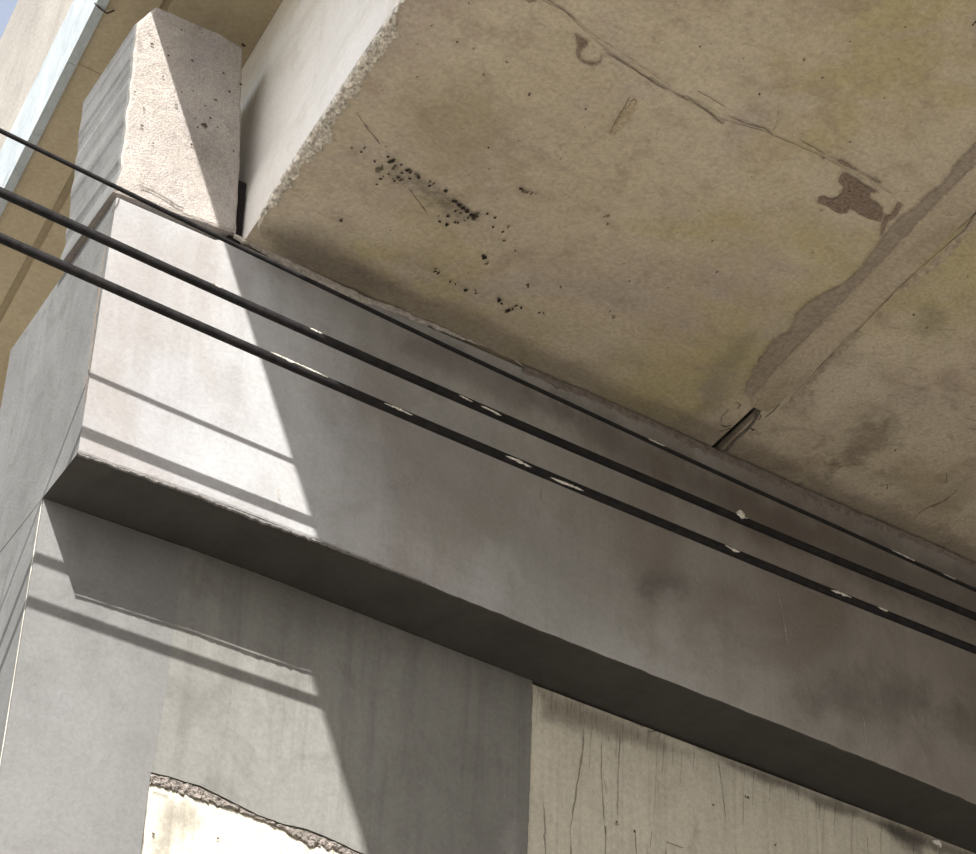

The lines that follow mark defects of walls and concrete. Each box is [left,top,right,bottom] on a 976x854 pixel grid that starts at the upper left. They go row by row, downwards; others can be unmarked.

spalling [256,0,406,228]
crack [543,0,879,186]
water stain [743,143,976,397]
crack [856,213,976,332]
crack [720,352,835,432]
spalling [150,774,359,854]
crack [195,785,358,853]